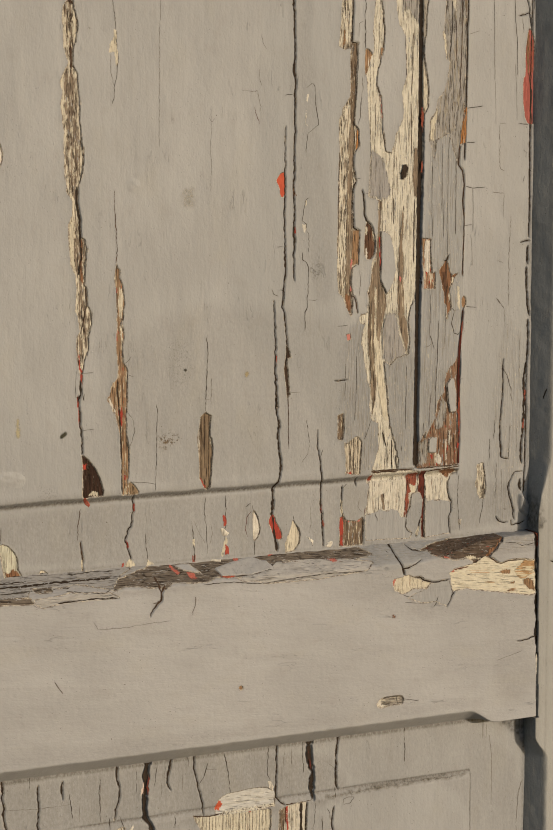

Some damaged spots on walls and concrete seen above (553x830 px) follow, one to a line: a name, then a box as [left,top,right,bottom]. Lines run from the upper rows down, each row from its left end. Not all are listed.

peeling [0,0,537,606]
crack [271,0,319,551]
crack [302,0,538,704]
crack [1,778,80,830]
crack [99,754,231,830]
peeling [193,781,307,830]